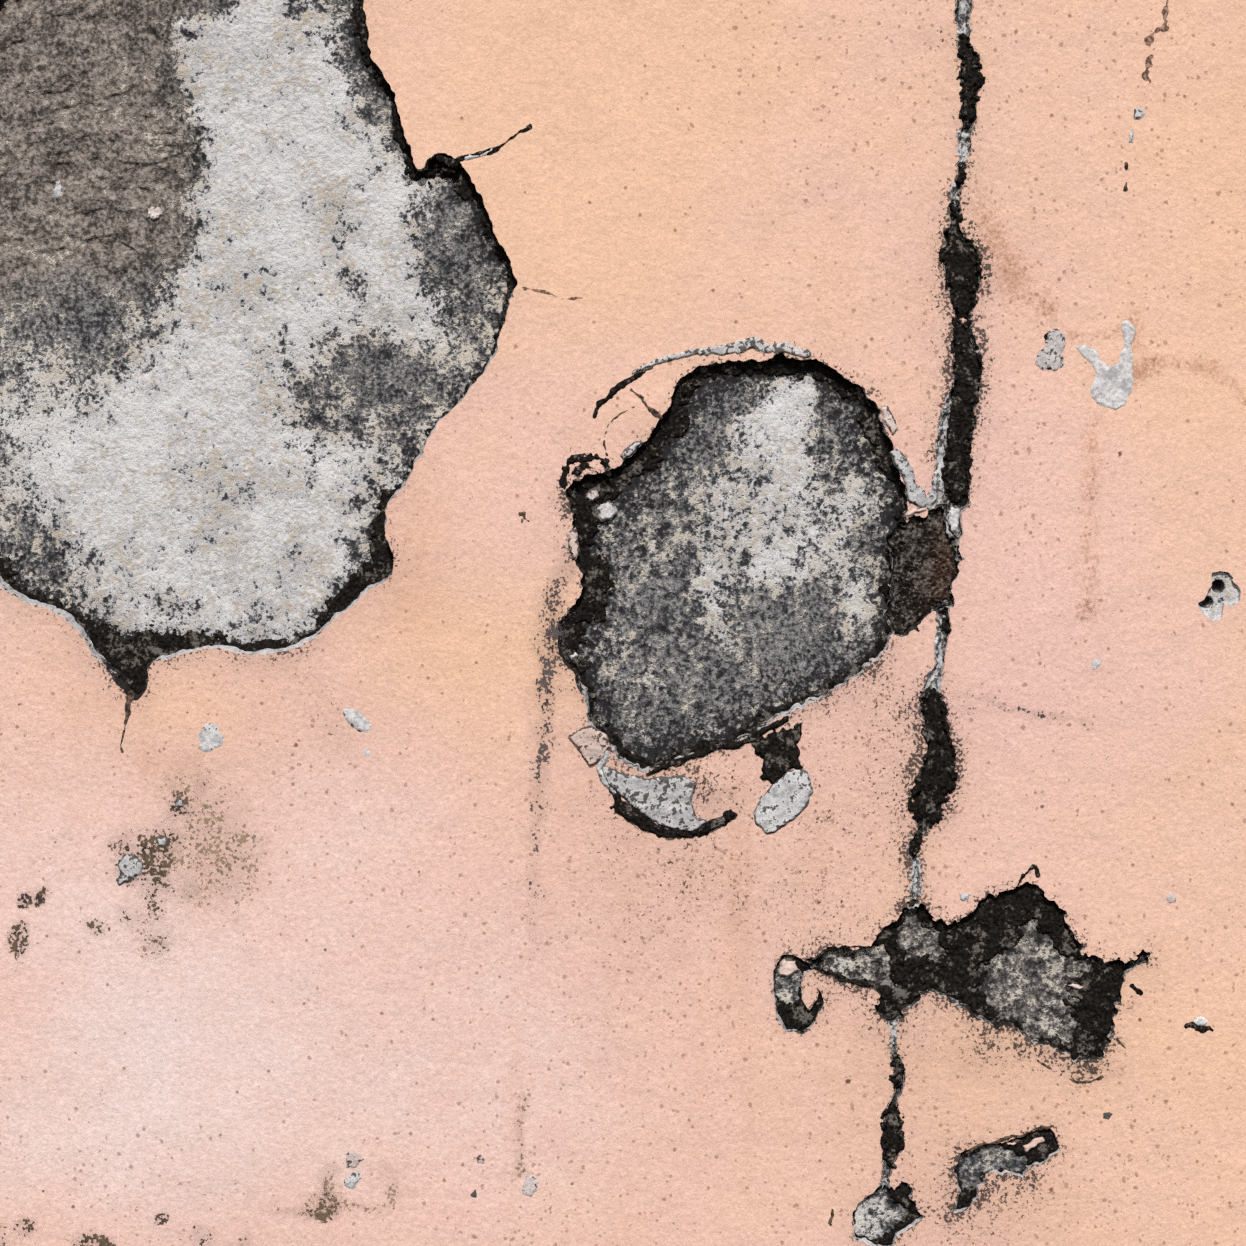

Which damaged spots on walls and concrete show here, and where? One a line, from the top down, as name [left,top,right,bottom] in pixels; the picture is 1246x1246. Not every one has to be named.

crack [436,124,532,166]
flaking render [0,0,518,701]
peeling [1035,320,1136,410]
crack [907,0,987,909]
flaking render [558,336,928,839]
spalling [1198,571,1241,621]
flaking render [773,864,1151,1084]
flaking render [852,1178,924,1246]
crack [880,1020,906,1188]
flaking render [953,1125,1060,1214]